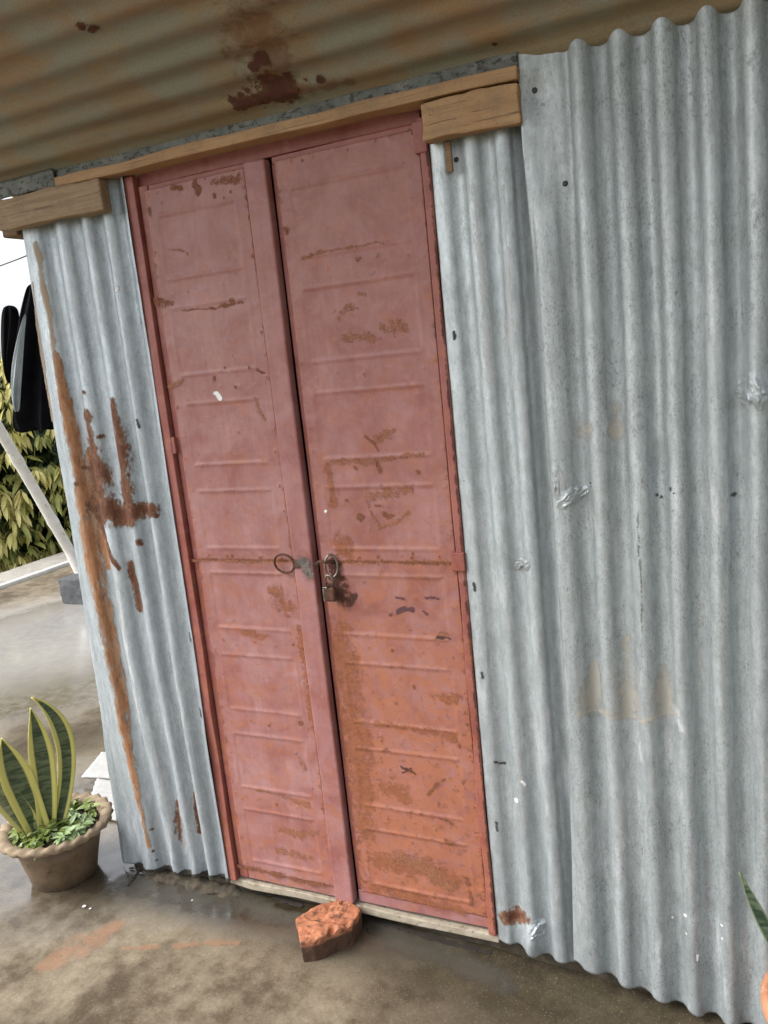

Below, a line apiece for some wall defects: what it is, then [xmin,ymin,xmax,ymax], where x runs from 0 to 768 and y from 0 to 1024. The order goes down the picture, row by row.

corrosion [228,51,325,111]
corrosion [425,146,463,552]
corrosion [32,242,160,861]
corrosion [327,533,358,607]
corrosion [431,572,530,931]
corrosion [174,793,201,854]
corrosion [365,850,473,917]